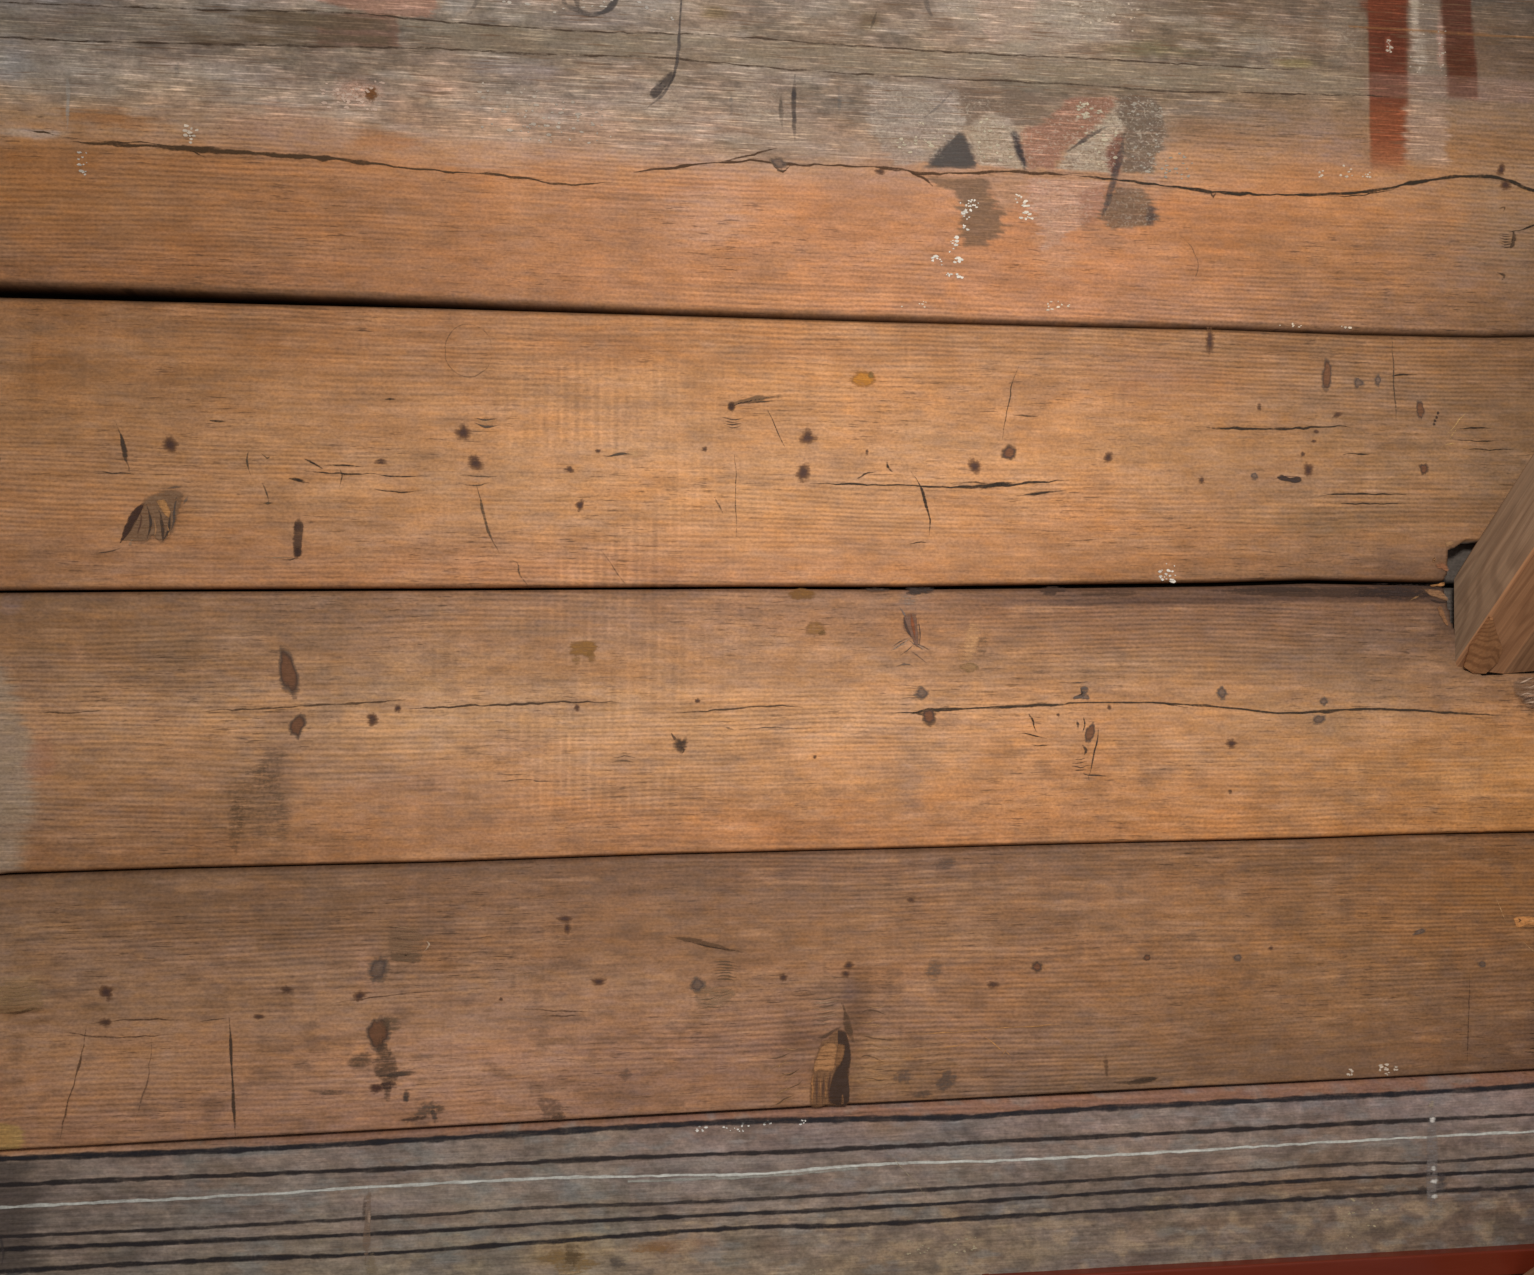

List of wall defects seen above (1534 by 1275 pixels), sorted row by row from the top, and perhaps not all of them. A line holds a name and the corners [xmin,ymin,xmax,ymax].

crack [34,131,603,186]
crack [637,149,1534,232]